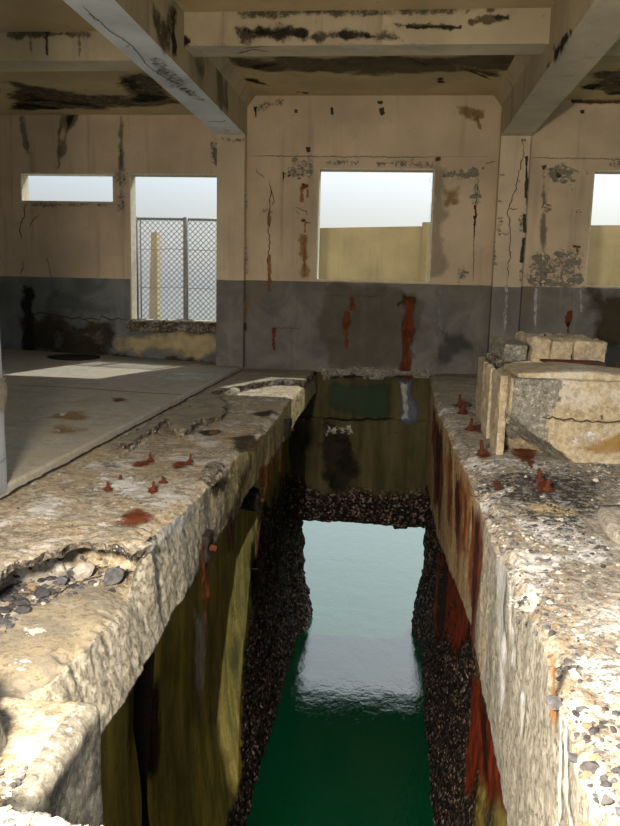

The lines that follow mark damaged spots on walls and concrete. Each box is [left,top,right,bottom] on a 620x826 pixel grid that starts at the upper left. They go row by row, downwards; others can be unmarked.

water stain [7,73,180,165]
water stain [188,8,515,85]
water stain [581,69,620,95]
crack [503,142,524,318]
peeling [518,156,588,288]
corrosion [400,295,416,378]
water stain [579,287,620,346]
crack [0,372,238,500]
crack [543,415,620,423]
spalling [0,525,156,584]
corrosion [117,508,150,527]
corrosion [432,410,482,654]